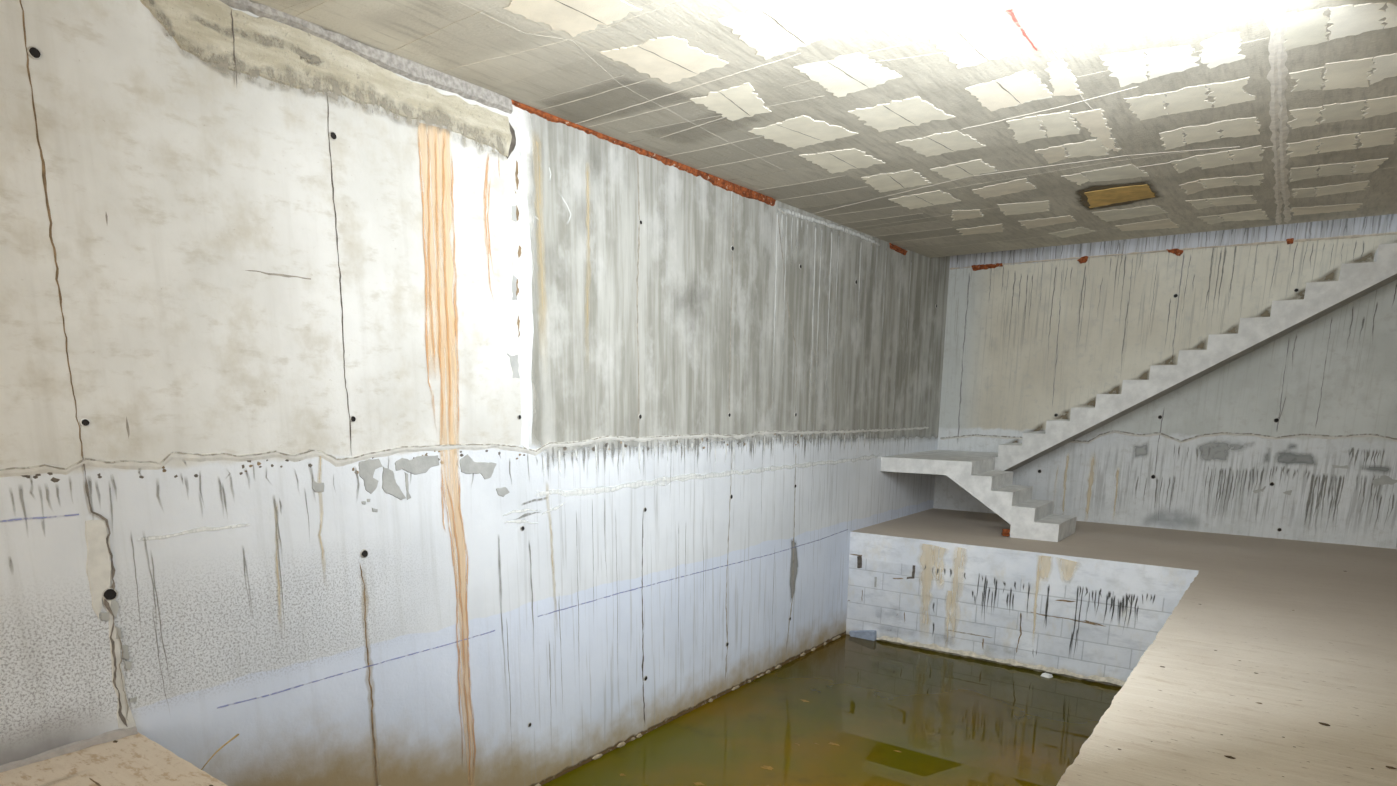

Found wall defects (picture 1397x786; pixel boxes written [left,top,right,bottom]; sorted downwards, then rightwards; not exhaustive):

spalling [140,0,776,222]
peeling [512,275,520,338]
leakage [528,114,985,471]
peeling [507,353,520,378]
corrosion [419,123,476,769]
leakage [1174,447,1394,521]
leakage [131,537,166,683]
leakage [924,546,1049,632]
leakage [1067,560,1155,652]